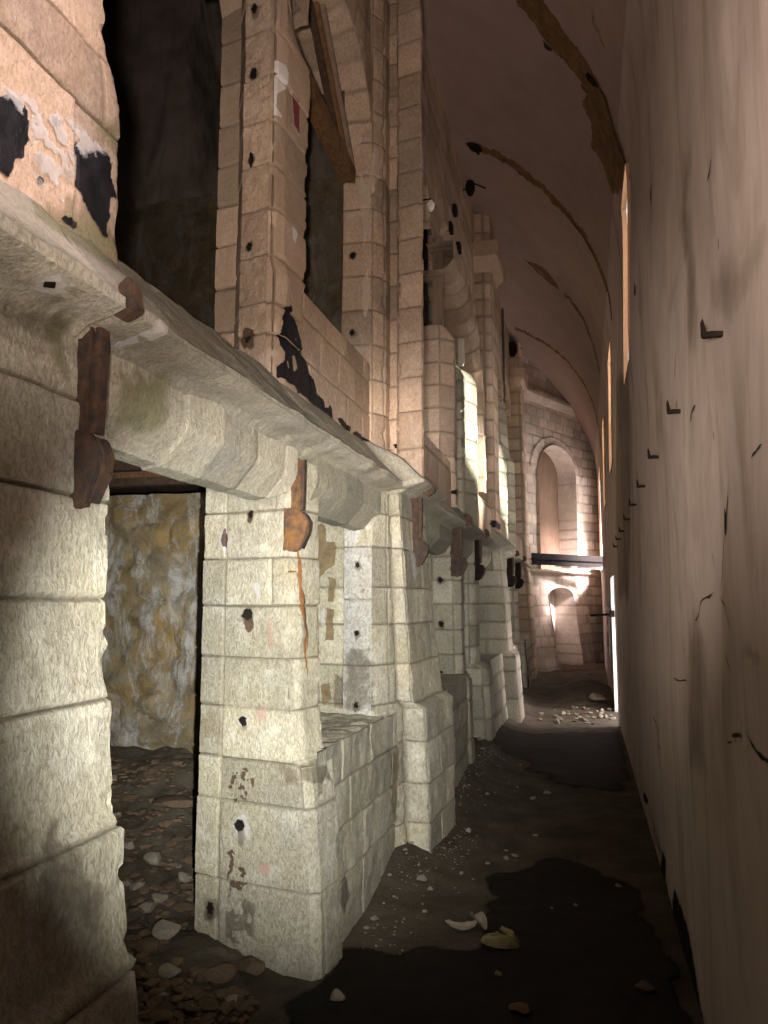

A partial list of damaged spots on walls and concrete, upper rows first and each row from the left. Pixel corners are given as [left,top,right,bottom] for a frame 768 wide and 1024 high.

peeling [0,94,29,177]
peeling [62,215,77,229]
peeling [74,142,117,237]
peeling [516,0,630,195]
peeling [276,306,371,442]
corrosion [288,551,308,677]
crack [693,495,731,669]
corrosion [229,768,254,802]